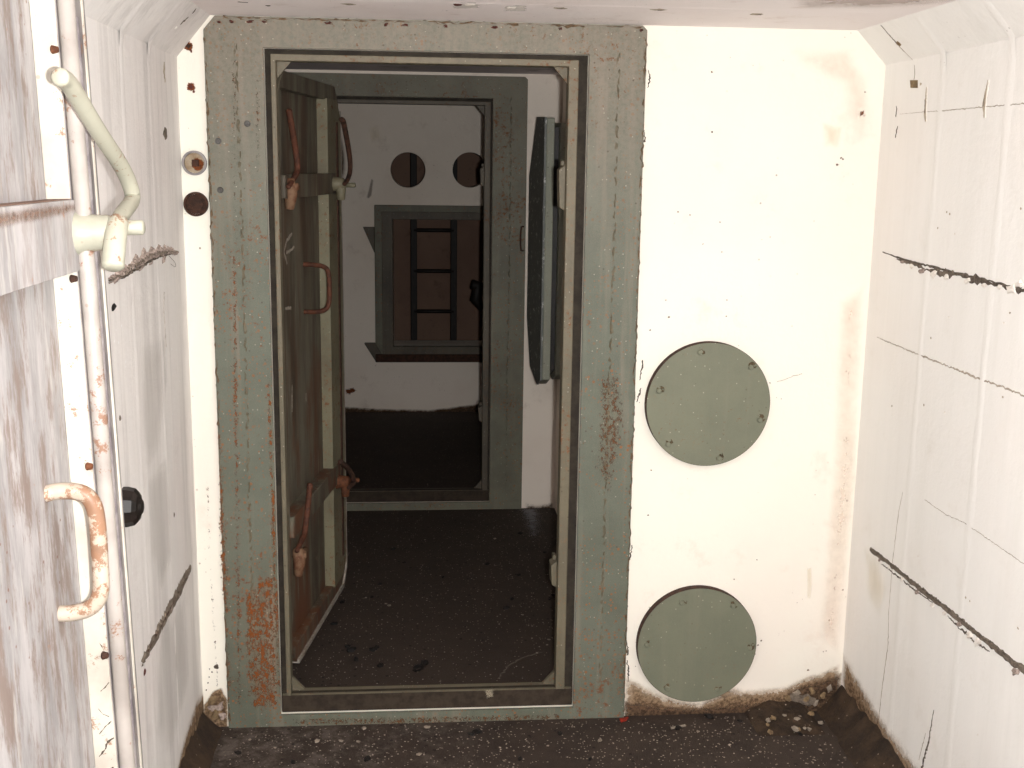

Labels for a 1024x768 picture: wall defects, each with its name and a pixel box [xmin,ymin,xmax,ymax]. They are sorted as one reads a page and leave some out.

rust [184,37,214,275]
rust [604,25,648,385]
crack [883,252,1024,294]
crack [141,565,191,676]
rust [207,290,281,721]
rust [595,376,635,712]
water stain [625,665,913,768]
crack [870,493,1024,721]